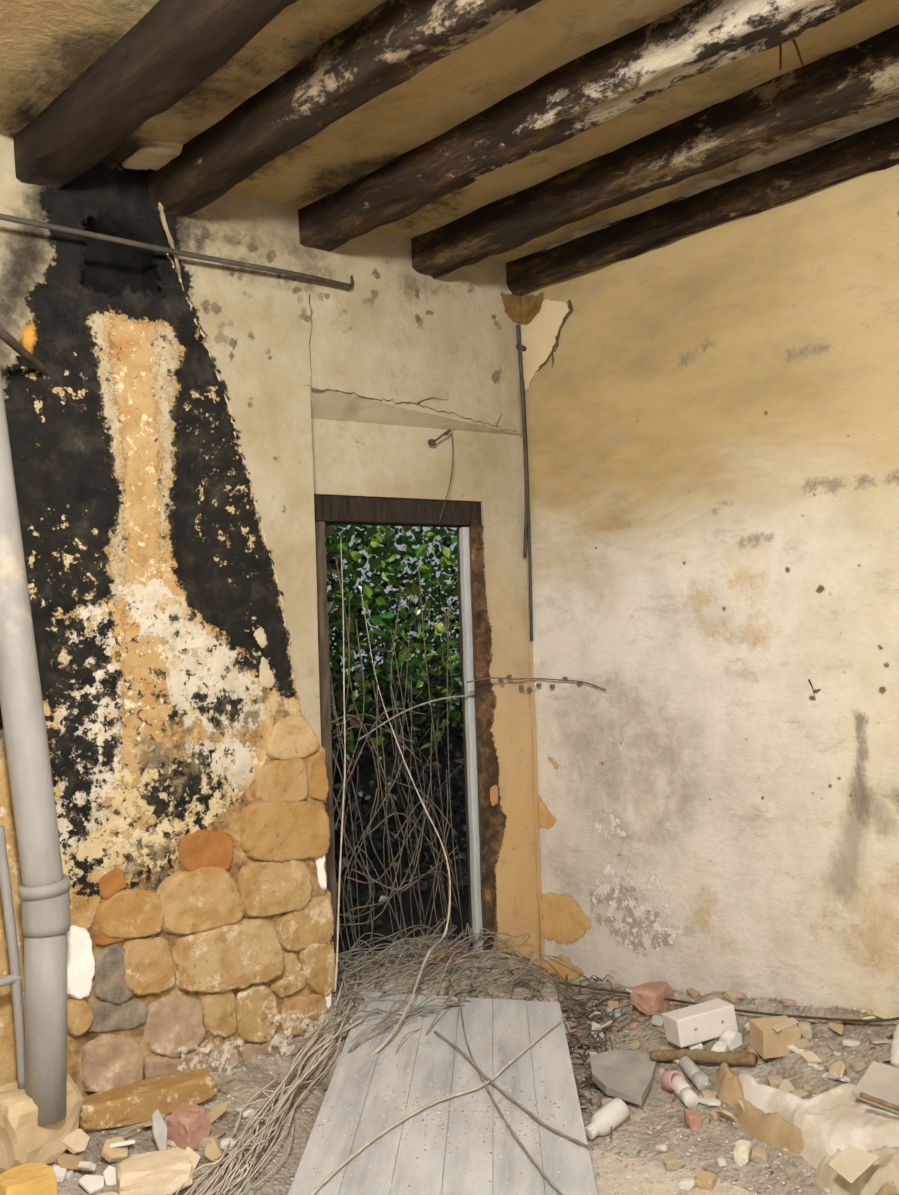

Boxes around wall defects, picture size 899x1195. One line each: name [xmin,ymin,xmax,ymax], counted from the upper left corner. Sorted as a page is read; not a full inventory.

damp [0,30,124,127]
peeling [197,226,311,322]
damp [0,132,298,700]
crack [309,294,516,432]
peeling [492,292,569,391]
spalling [43,253,305,930]
spalling [470,516,507,939]
peeling [538,796,556,828]
damp [854,714,868,821]
spalling [0,750,25,1086]
peeling [541,854,685,983]
damp [590,883,672,950]